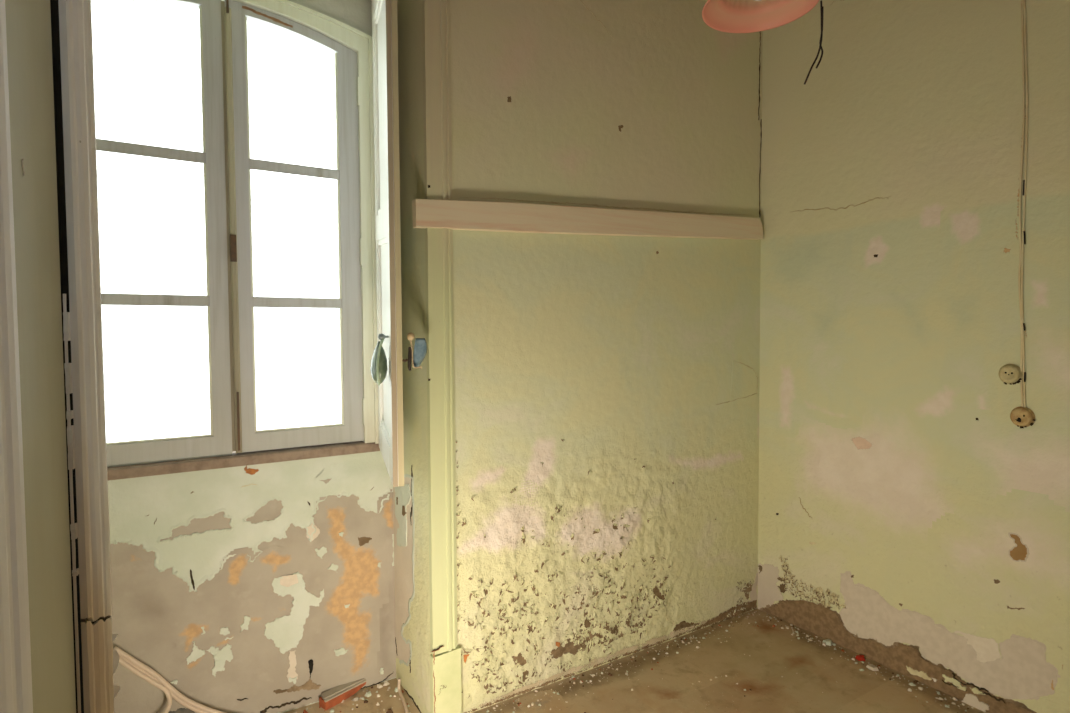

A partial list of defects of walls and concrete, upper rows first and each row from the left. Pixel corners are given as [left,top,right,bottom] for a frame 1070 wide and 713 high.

crack [464,31,762,216]
peeling [775,311,1070,617]
peeling [110,474,415,713]
flaking render [671,619,701,636]
leakage [465,599,1037,713]
peeling [727,555,1061,700]